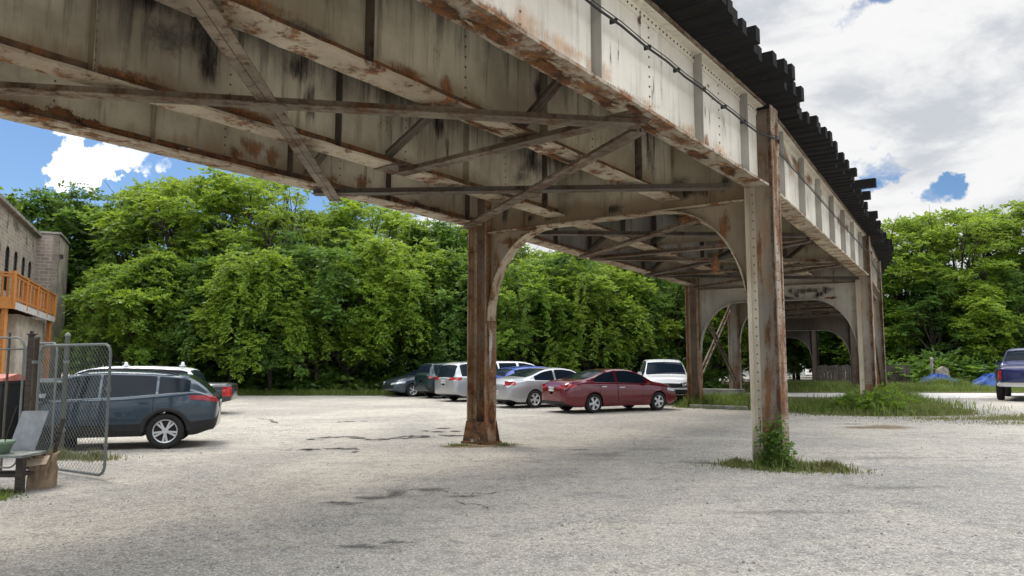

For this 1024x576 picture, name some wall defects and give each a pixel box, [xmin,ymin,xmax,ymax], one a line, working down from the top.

rust [237,0,283,12]
damp [150,17,215,79]
rust [392,63,424,85]
rust [232,140,278,164]
rust [477,232,537,429]
rust [764,321,785,448]